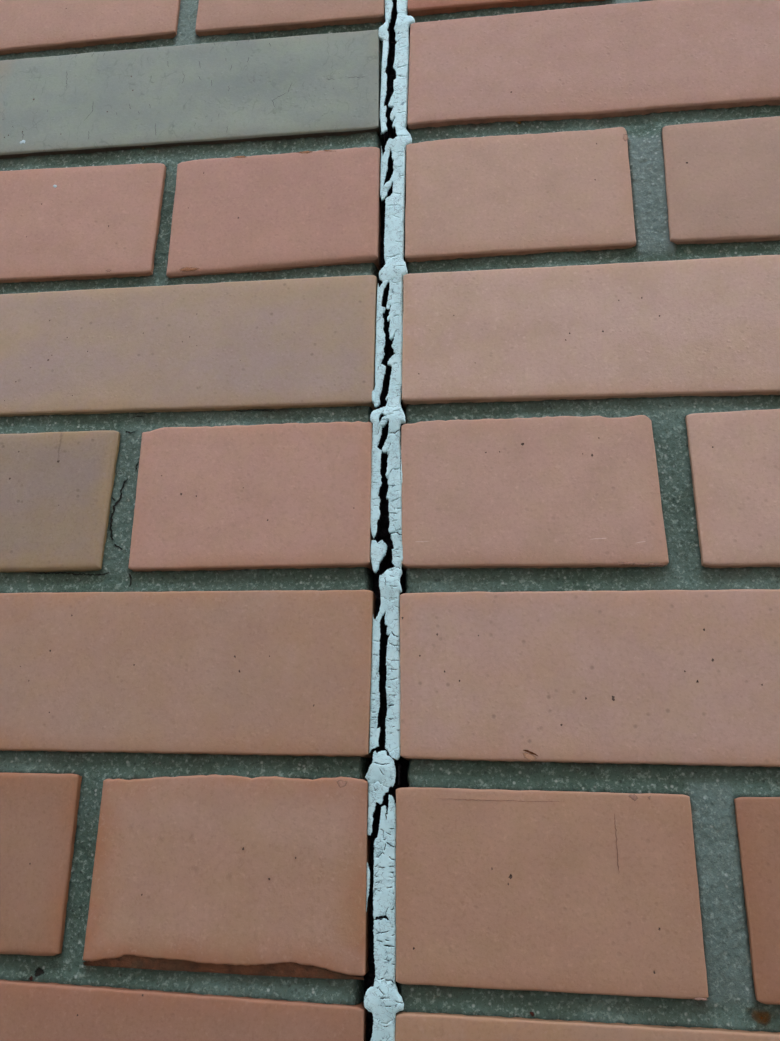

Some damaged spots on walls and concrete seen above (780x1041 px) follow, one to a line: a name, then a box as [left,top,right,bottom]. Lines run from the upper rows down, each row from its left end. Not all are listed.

crack [33,462,139,586]
crack [328,0,403,1041]